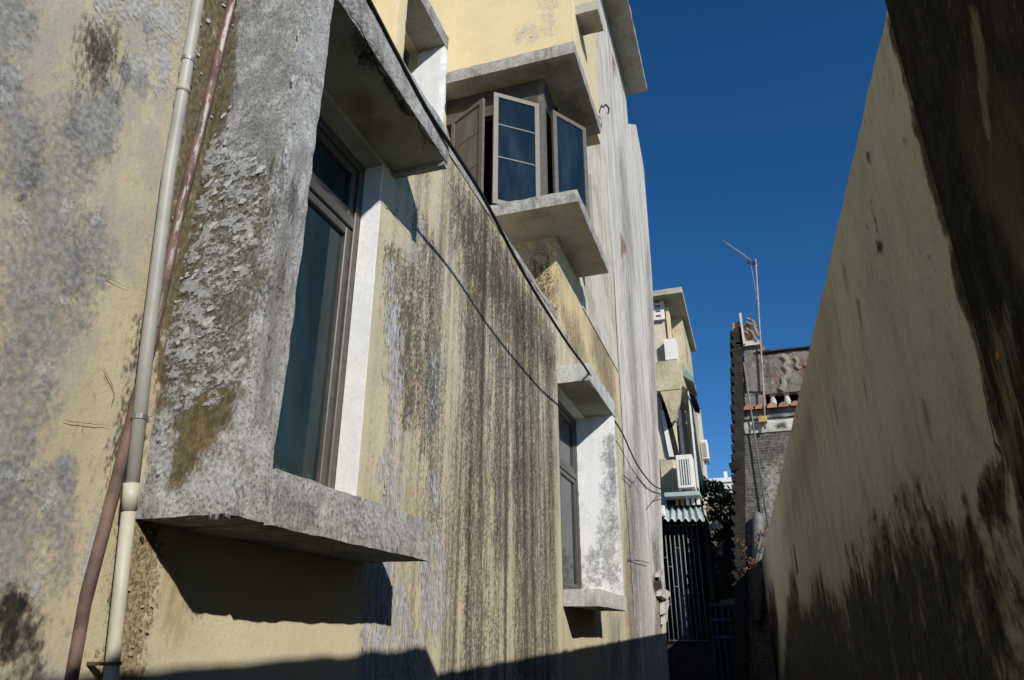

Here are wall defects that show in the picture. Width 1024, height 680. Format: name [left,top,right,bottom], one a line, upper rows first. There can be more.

leakage [75,14,129,102]
peeling [155,105,292,478]
leakage [97,313,144,506]
leakage [177,437,253,516]
leakage [381,166,616,680]
leakage [0,585,44,680]